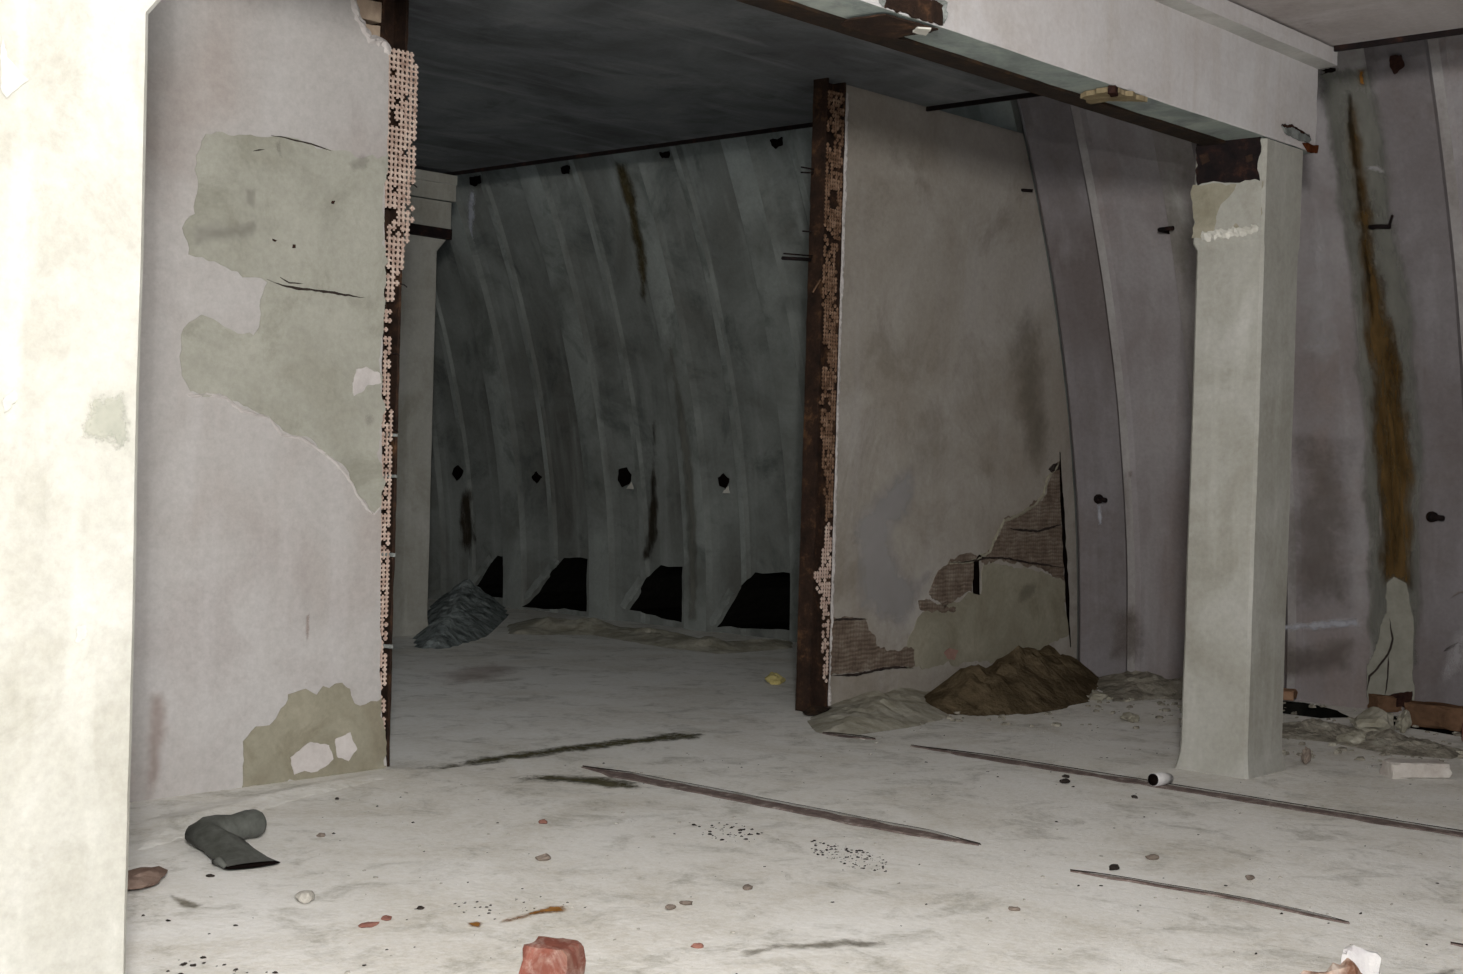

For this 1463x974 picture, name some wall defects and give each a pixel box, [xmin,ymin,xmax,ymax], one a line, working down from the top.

spalling [841,0,948,40]
peeling [179,132,388,515]
spalling [1201,224,1258,242]
corrosion [1348,95,1414,585]
flaking render [830,461,1070,677]
peeling [242,683,387,788]